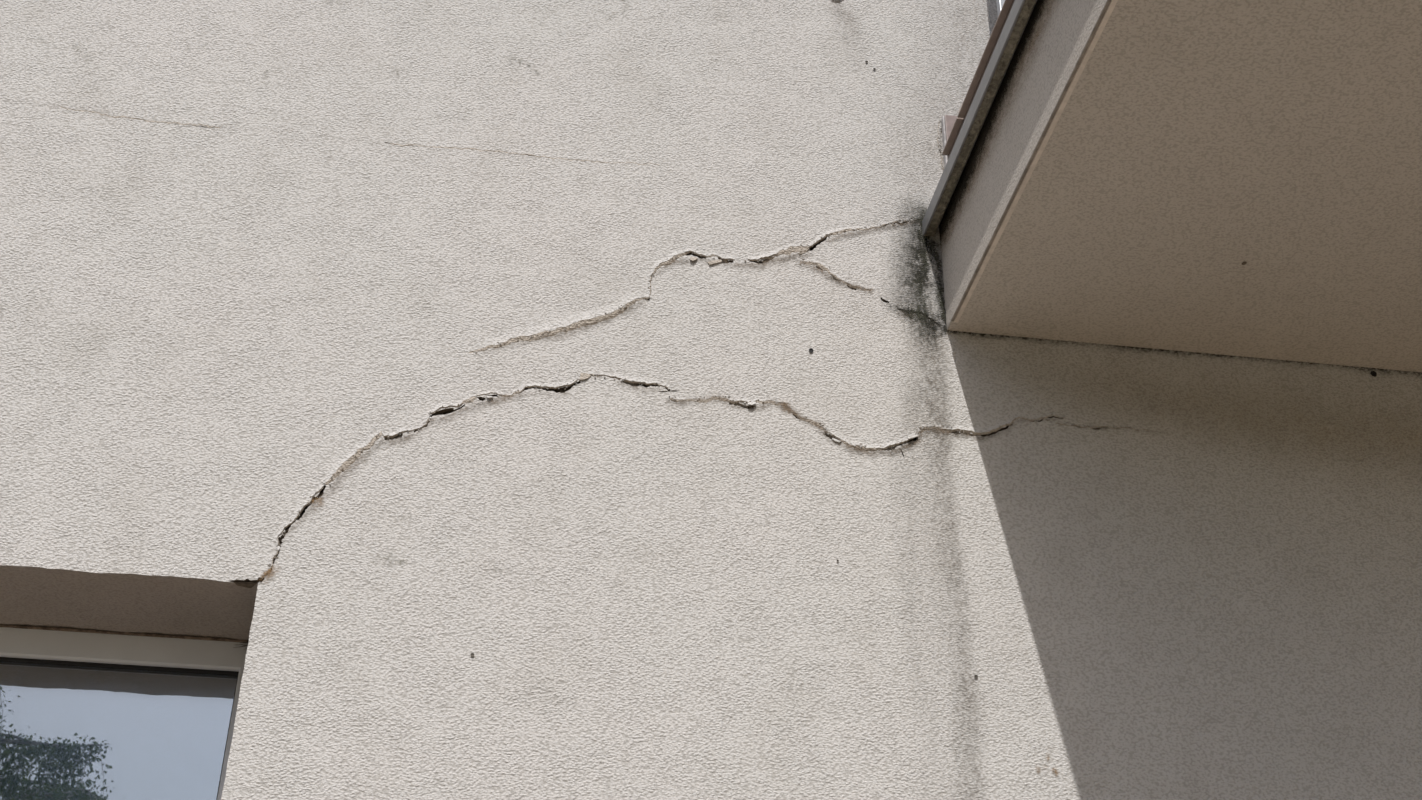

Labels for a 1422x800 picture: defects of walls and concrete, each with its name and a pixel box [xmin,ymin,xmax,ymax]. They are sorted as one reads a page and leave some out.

crack [468,217,940,353]
leakage [891,208,948,448]
crack [230,371,1149,588]